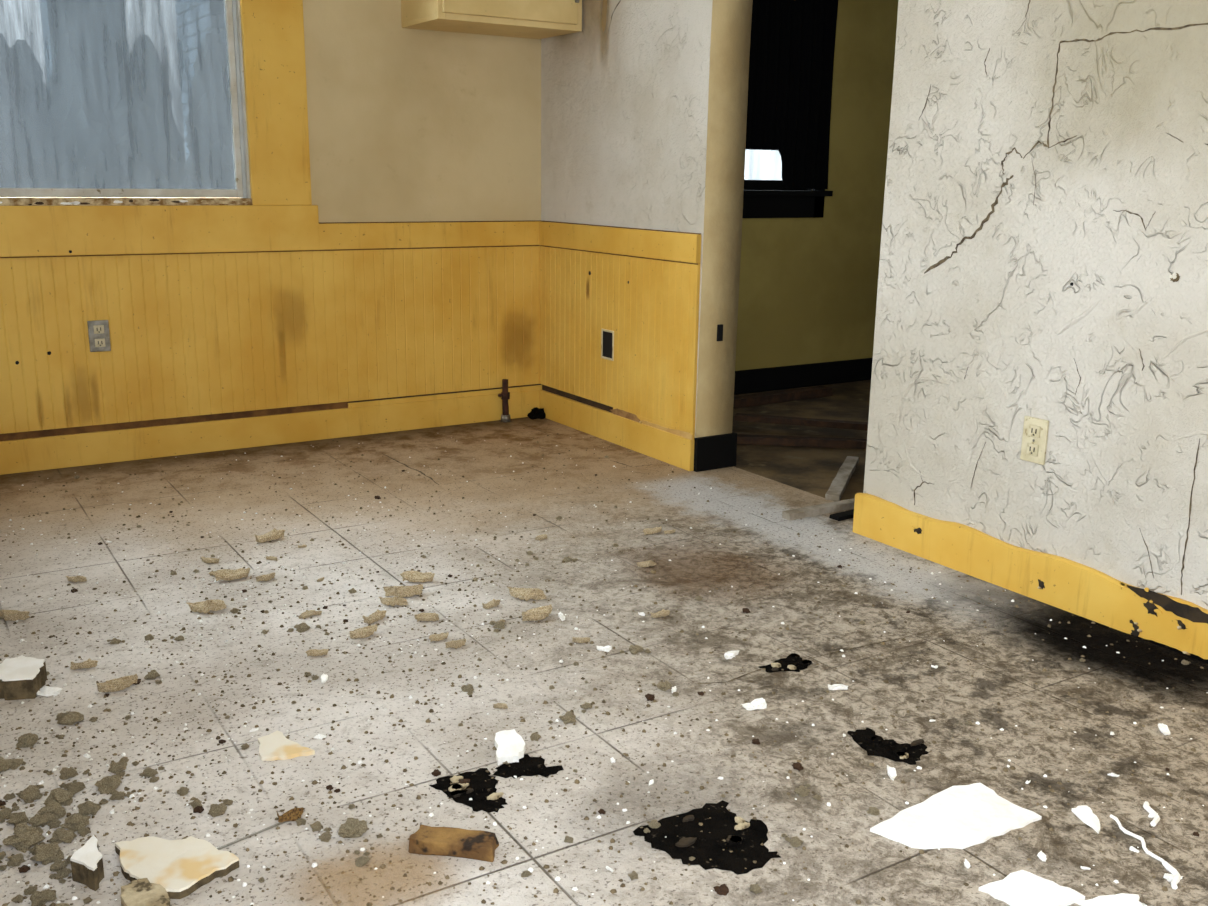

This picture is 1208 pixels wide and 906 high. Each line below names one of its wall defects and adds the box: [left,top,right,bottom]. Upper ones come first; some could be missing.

crack [924,23,1208,274]
peeling [1119,582,1208,663]
peeling [865,735,924,759]
peeling [675,837,697,847]
peeling [726,817,750,846]